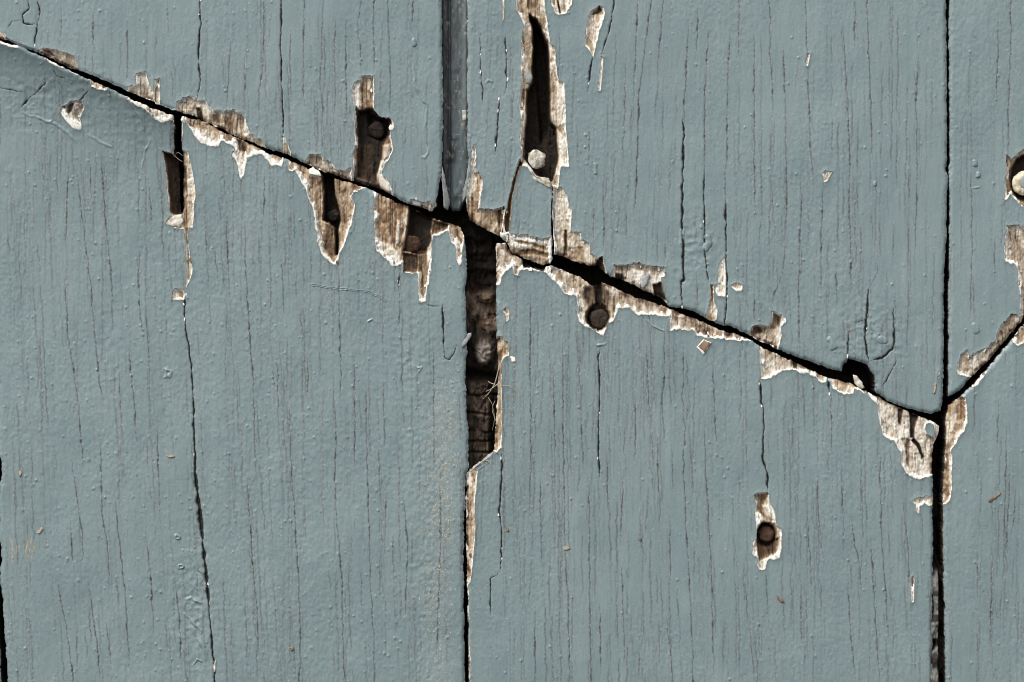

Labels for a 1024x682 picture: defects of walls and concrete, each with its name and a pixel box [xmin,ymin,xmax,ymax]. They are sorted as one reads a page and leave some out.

peeling [126,71,395,198]
crack [227,0,414,144]
peeling [408,145,668,306]
peeling [584,5,605,91]
crack [665,9,896,382]
crack [183,293,215,682]
peeling [466,466,478,682]
crack [489,453,503,615]
peeling [493,336,516,452]
crack [529,306,625,678]
crack [759,383,769,489]
peeling [739,224,1024,513]